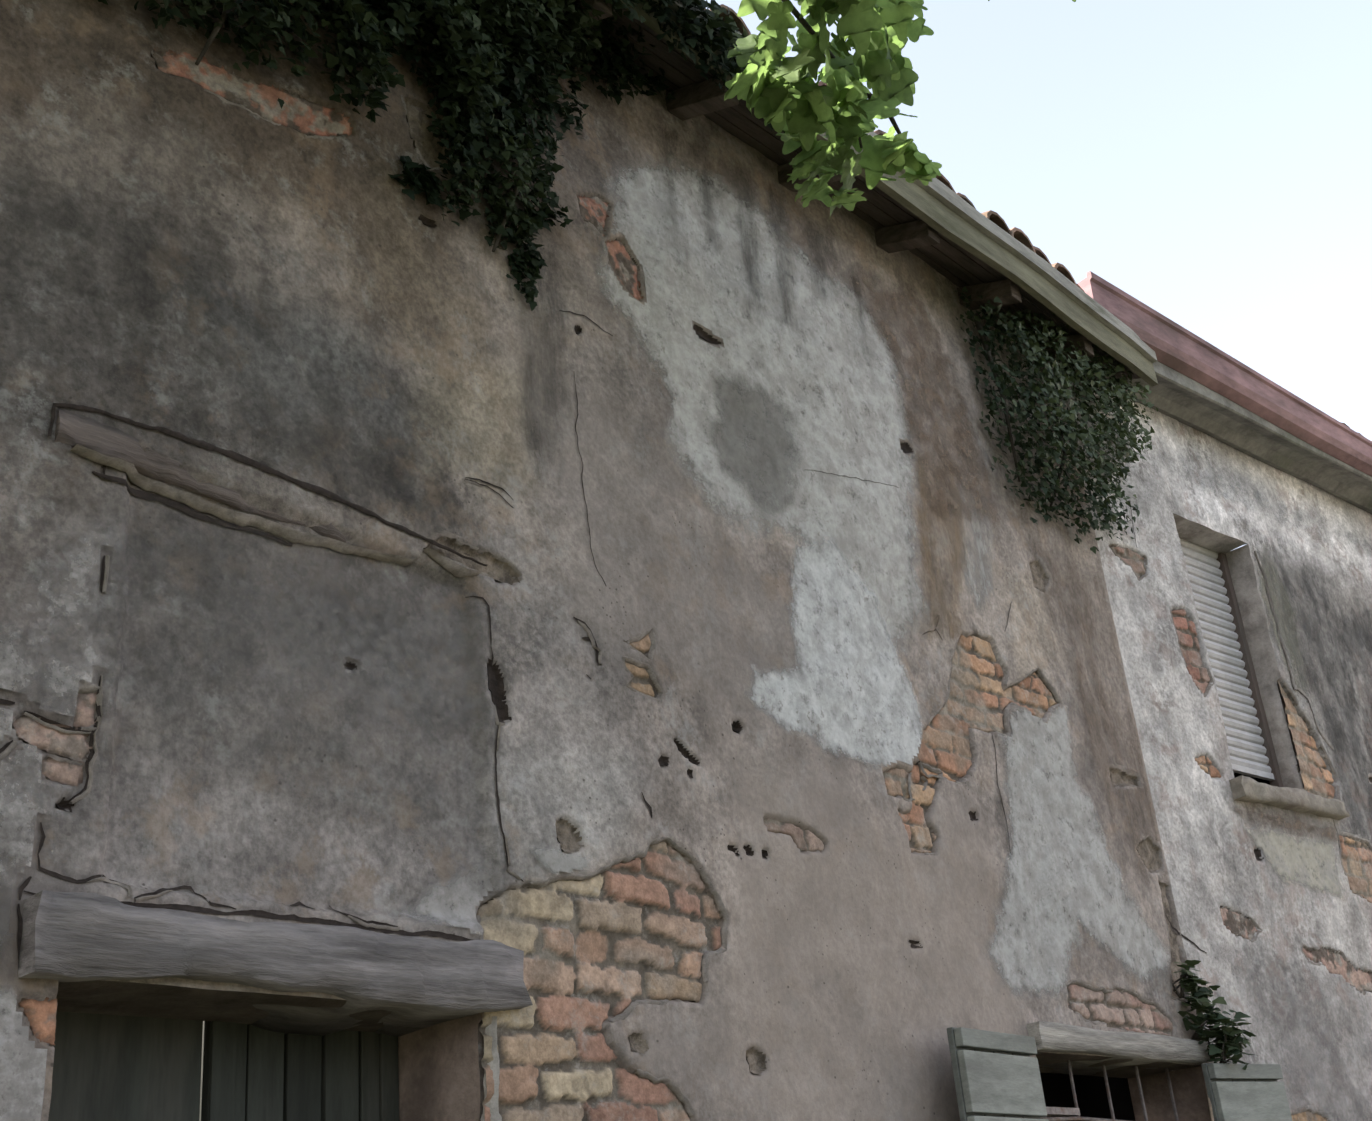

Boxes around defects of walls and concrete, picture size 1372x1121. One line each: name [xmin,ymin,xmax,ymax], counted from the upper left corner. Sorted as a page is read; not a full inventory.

flaking render [151,47,353,140]
crack [100,555,110,593]
crack [465,596,494,668]
peeling [577,165,1189,1037]
flaking render [1170,609,1214,697]
flaking render [12,683,103,812]
crack [0,675,472,965]
crack [495,722,523,881]
flaking render [1278,682,1341,801]
flaking render [477,818,729,1121]
flaking render [1301,944,1372,995]
peeling [0,991,58,1121]